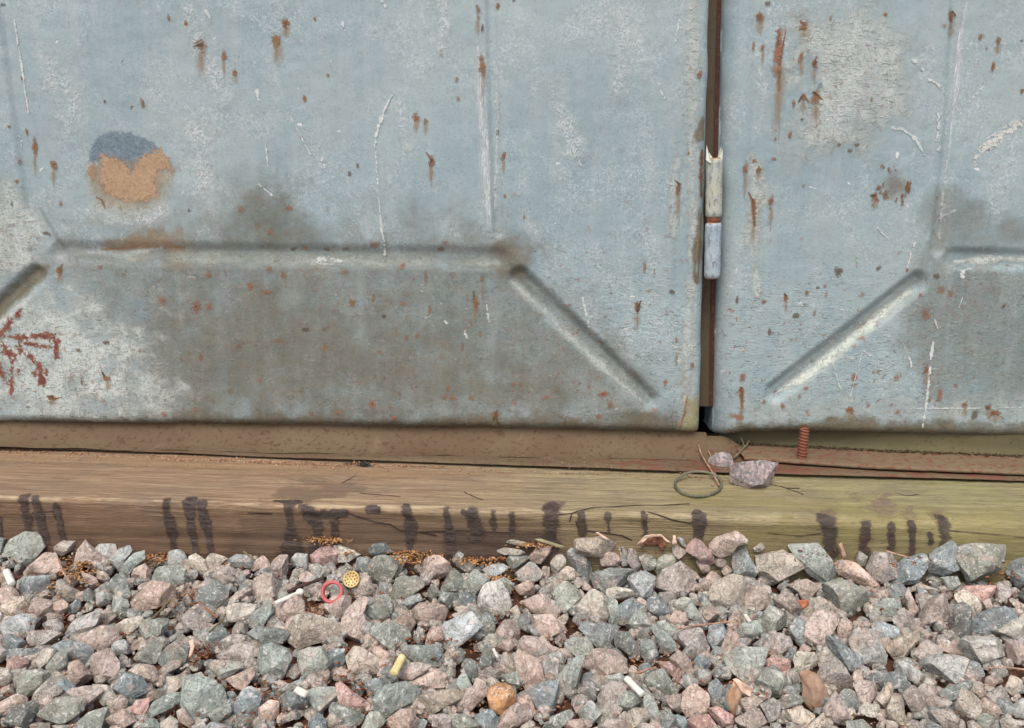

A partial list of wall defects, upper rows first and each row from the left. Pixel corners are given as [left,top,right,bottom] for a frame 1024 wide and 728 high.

corrosion [752,20,823,107]
peeling [85,130,173,227]
corrosion [688,150,703,197]
corrosion [748,192,773,226]
corrosion [870,181,912,205]
corrosion [693,213,702,284]
damp [37,193,679,431]